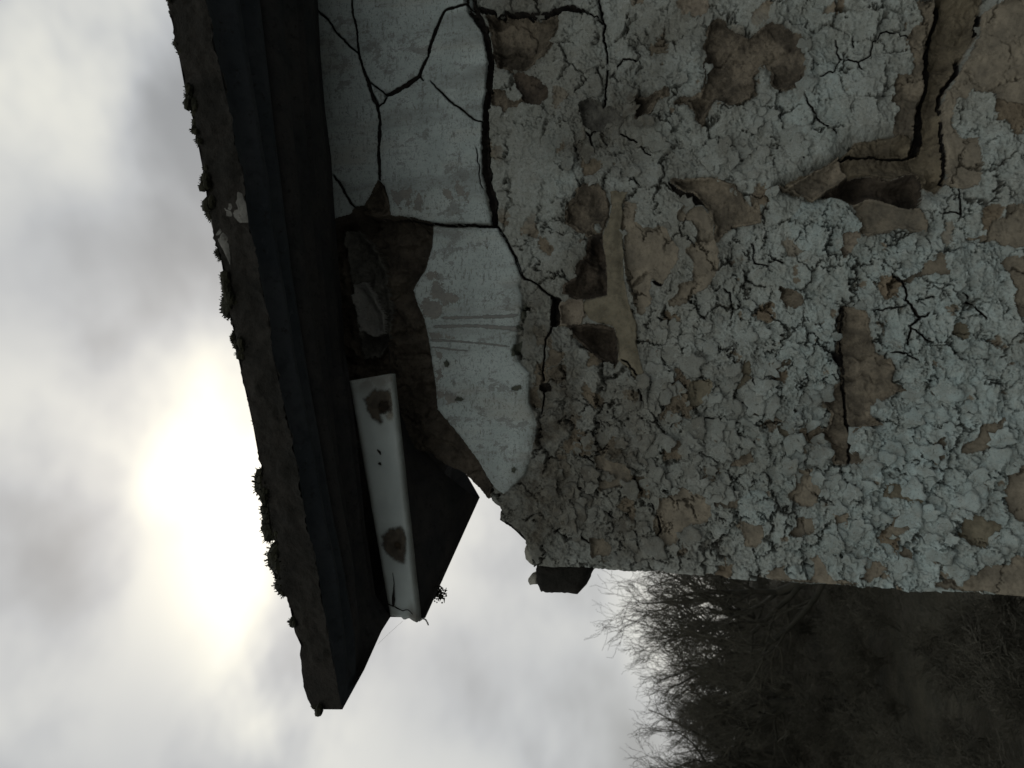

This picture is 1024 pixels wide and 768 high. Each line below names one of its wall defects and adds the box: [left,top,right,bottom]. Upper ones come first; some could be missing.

spalling [486,9,559,118]
spalling [626,18,813,127]
crack [803,8,964,218]
peeling [889,0,936,138]
crack [972,16,981,38]
peeling [938,0,1024,189]
crack [318,0,637,415]
corrosion [364,389,392,423]
spalling [335,180,494,499]
peeling [540,173,1024,596]
crack [832,308,851,464]
corrosion [381,527,406,563]